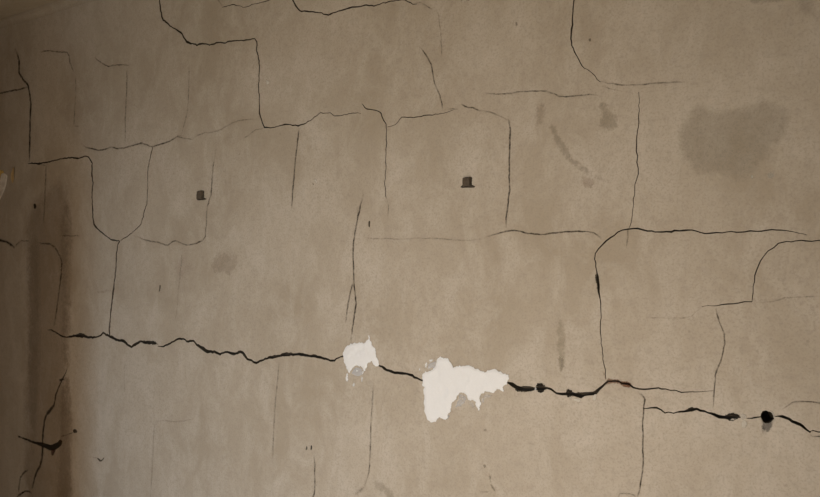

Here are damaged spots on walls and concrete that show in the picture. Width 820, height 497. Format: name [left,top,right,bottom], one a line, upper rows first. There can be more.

crack [159,0,478,200]
crack [525,0,618,97]
crack [0,55,343,364]
crack [347,205,361,330]
crack [500,84,820,487]
crack [18,370,67,495]
crack [379,365,423,381]